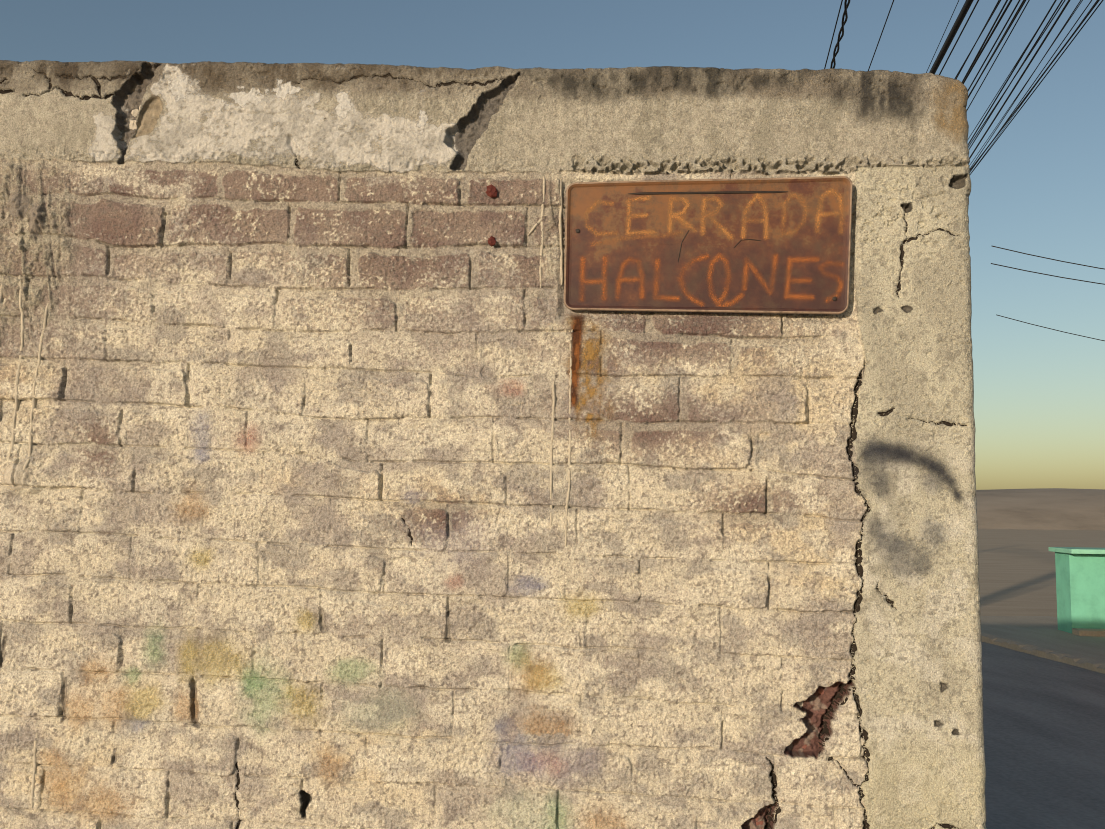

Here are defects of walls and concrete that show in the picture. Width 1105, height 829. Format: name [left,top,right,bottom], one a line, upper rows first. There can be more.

crack [0,69,126,100]
crack [896,214,958,297]
rust [569,316,602,428]
crack [234,762,242,829]
crack [764,757,781,829]